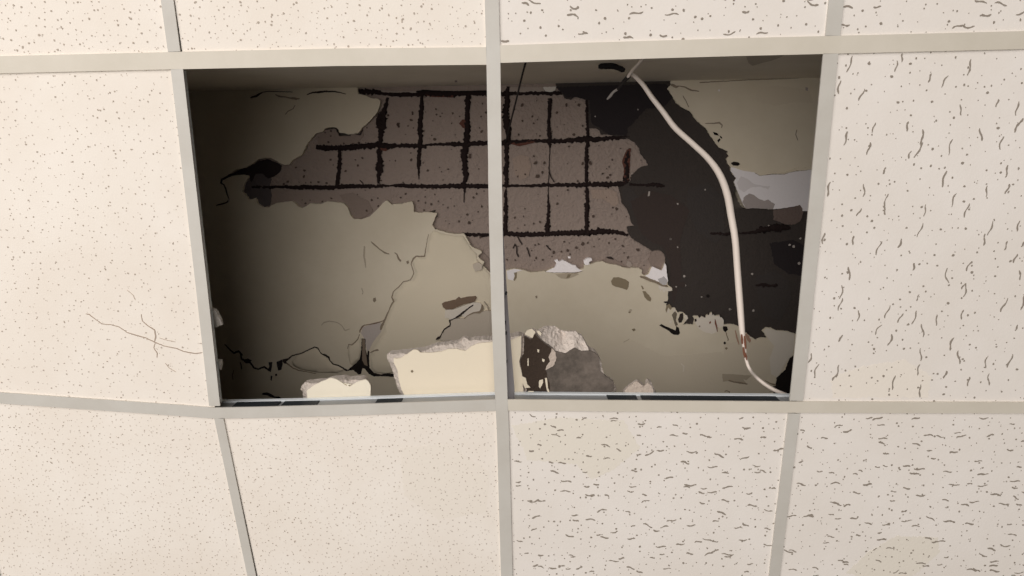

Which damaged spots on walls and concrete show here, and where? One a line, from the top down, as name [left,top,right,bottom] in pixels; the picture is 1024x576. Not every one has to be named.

rust [252,88,488,193]
spalling [258,85,490,265]
rust [501,86,665,237]
spalling [501,84,672,302]
leakage [556,83,673,136]
leakage [745,55,784,66]
flaking render [731,162,812,211]
crack [87,234,429,399]
crack [436,302,490,340]
leakage [596,183,773,393]
flaking render [764,328,795,393]
leakage [756,240,804,320]